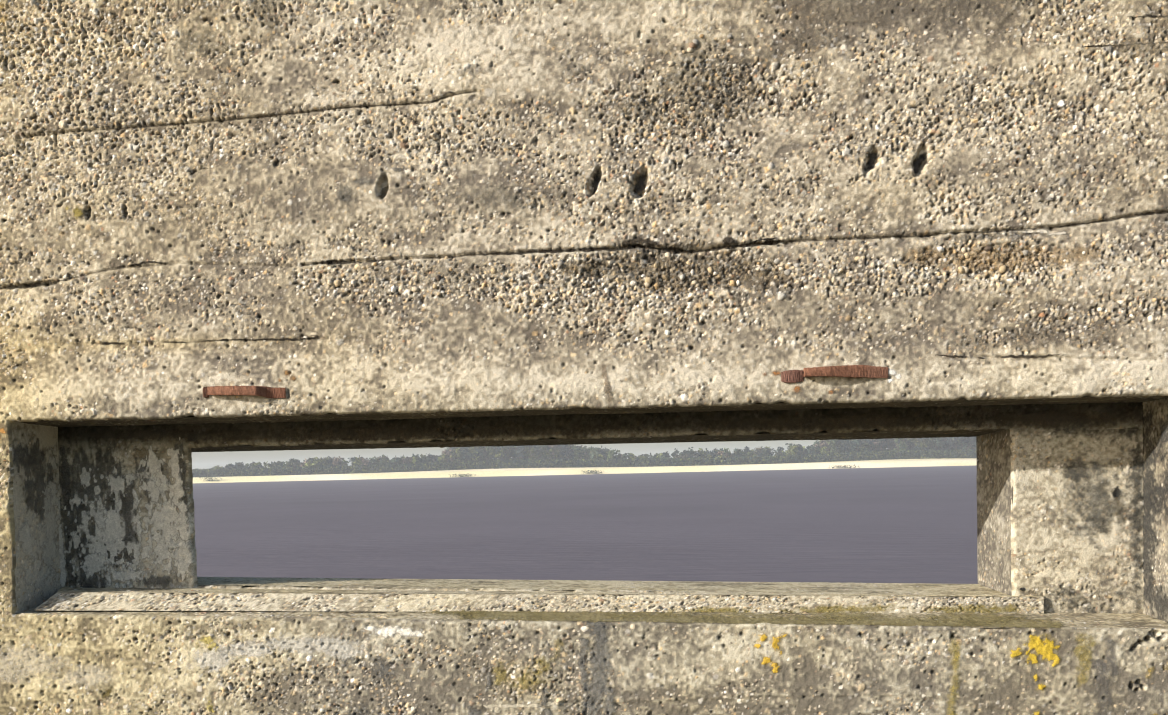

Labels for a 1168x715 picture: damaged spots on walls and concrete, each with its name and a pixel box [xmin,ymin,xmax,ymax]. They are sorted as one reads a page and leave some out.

crack [106,91,471,130]
crack [392,211,1168,261]
crack [0,275,84,290]
crack [116,261,167,269]
crack [316,259,359,267]
damp [23,447,137,588]
damp [137,575,170,587]
damp [578,621,614,715]